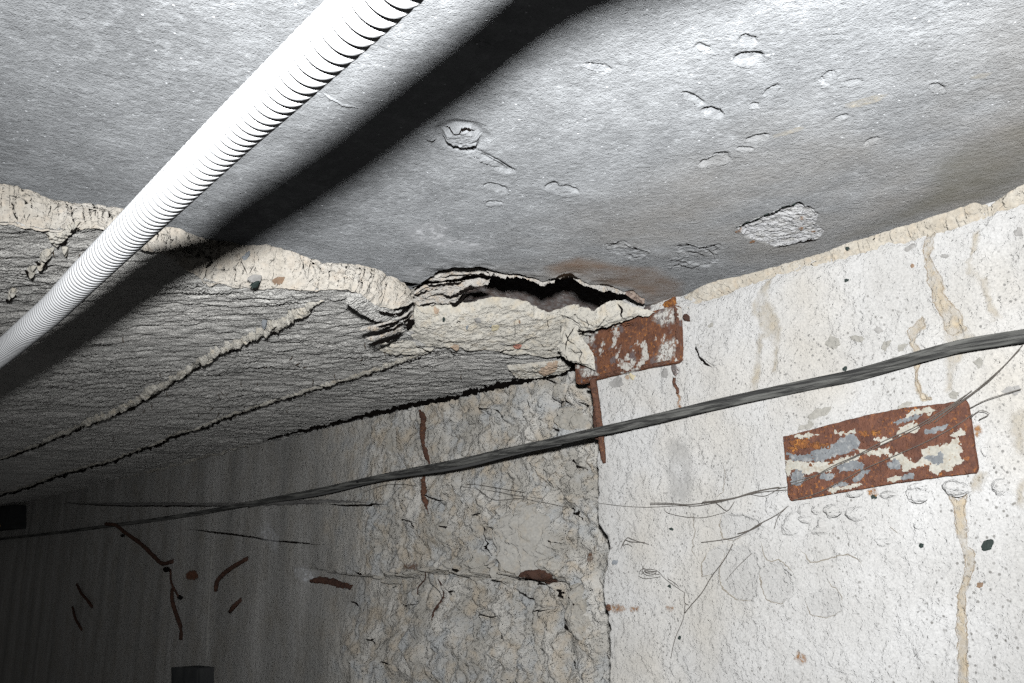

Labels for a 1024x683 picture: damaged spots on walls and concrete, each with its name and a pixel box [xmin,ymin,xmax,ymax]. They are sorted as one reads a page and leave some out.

spalling [0,184,124,279]
spalling [734,202,824,248]
spalling [142,227,580,358]
leakage [922,248,967,330]
crack [1,309,317,460]
crack [263,304,630,441]
leakage [911,343,932,401]
crack [0,349,447,545]
corrosion [858,430,881,448]
corrosion [309,576,353,590]
corrosion [518,569,559,585]
leakage [947,483,976,683]